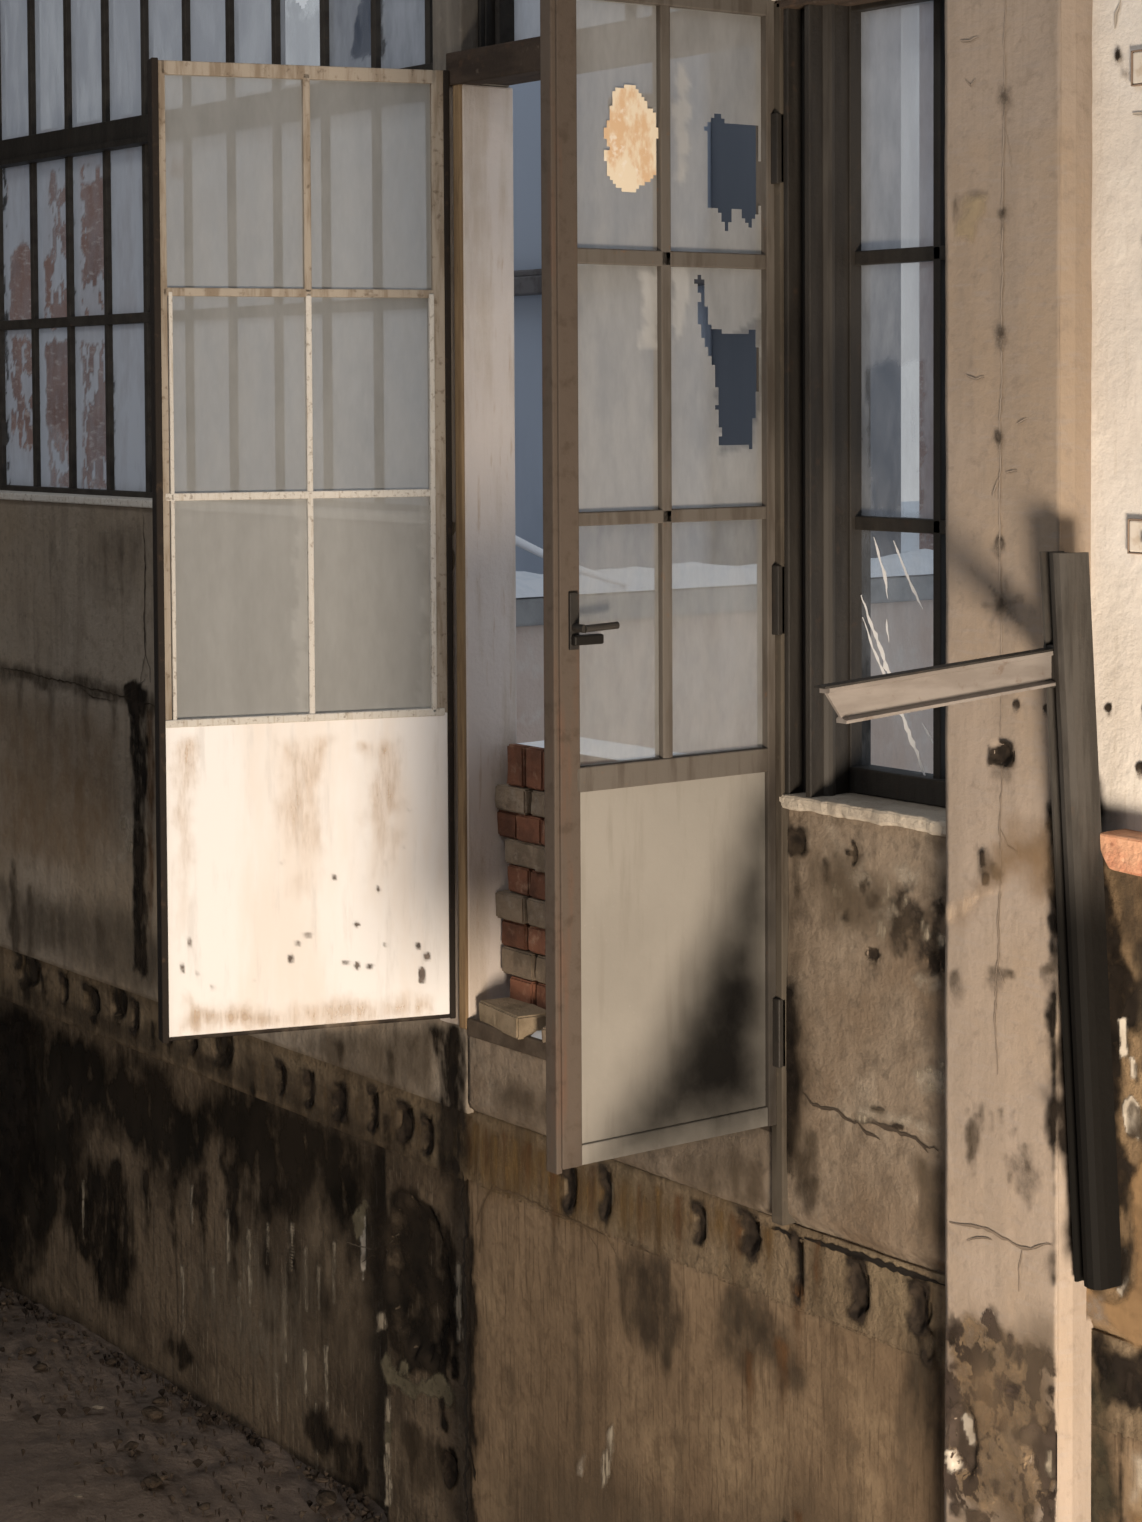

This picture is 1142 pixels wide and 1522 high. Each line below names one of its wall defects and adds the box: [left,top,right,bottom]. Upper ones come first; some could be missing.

water stain [1,667,158,986]
water stain [1048,889,1056,953]
water stain [430,1026,468,1187]
water stain [786,984,817,1193]
crack [803,1093,938,1153]
peeling [1119,1018,1137,1079]
peeling [1123,1096,1142,1142]
water stain [0,973,421,1492]
water stain [629,1257,681,1367]
crack [950,1222,1051,1285]
flaking render [1086,1161,1142,1348]
peeling [907,1279,1058,1522]